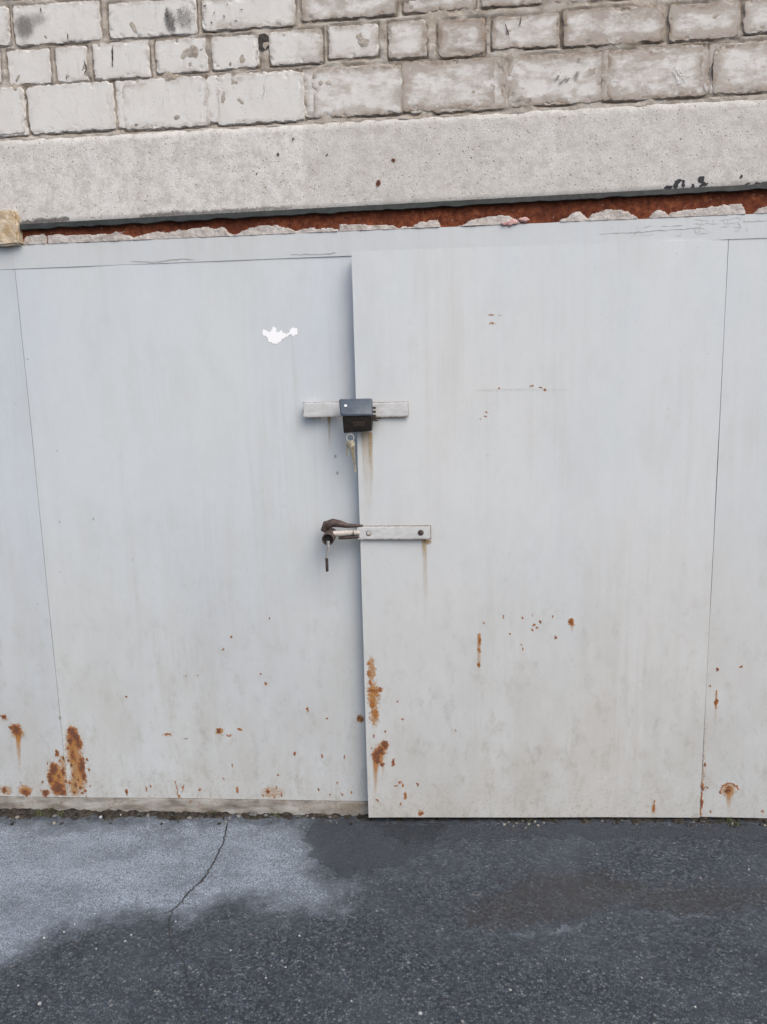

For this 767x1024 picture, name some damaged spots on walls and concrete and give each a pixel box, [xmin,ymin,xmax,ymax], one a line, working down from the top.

corrosion [0,715,24,748]
corrosion [1,726,91,797]
corrosion [357,658,395,776]
corrosion [700,763,740,815]
crack [157,823,228,1024]